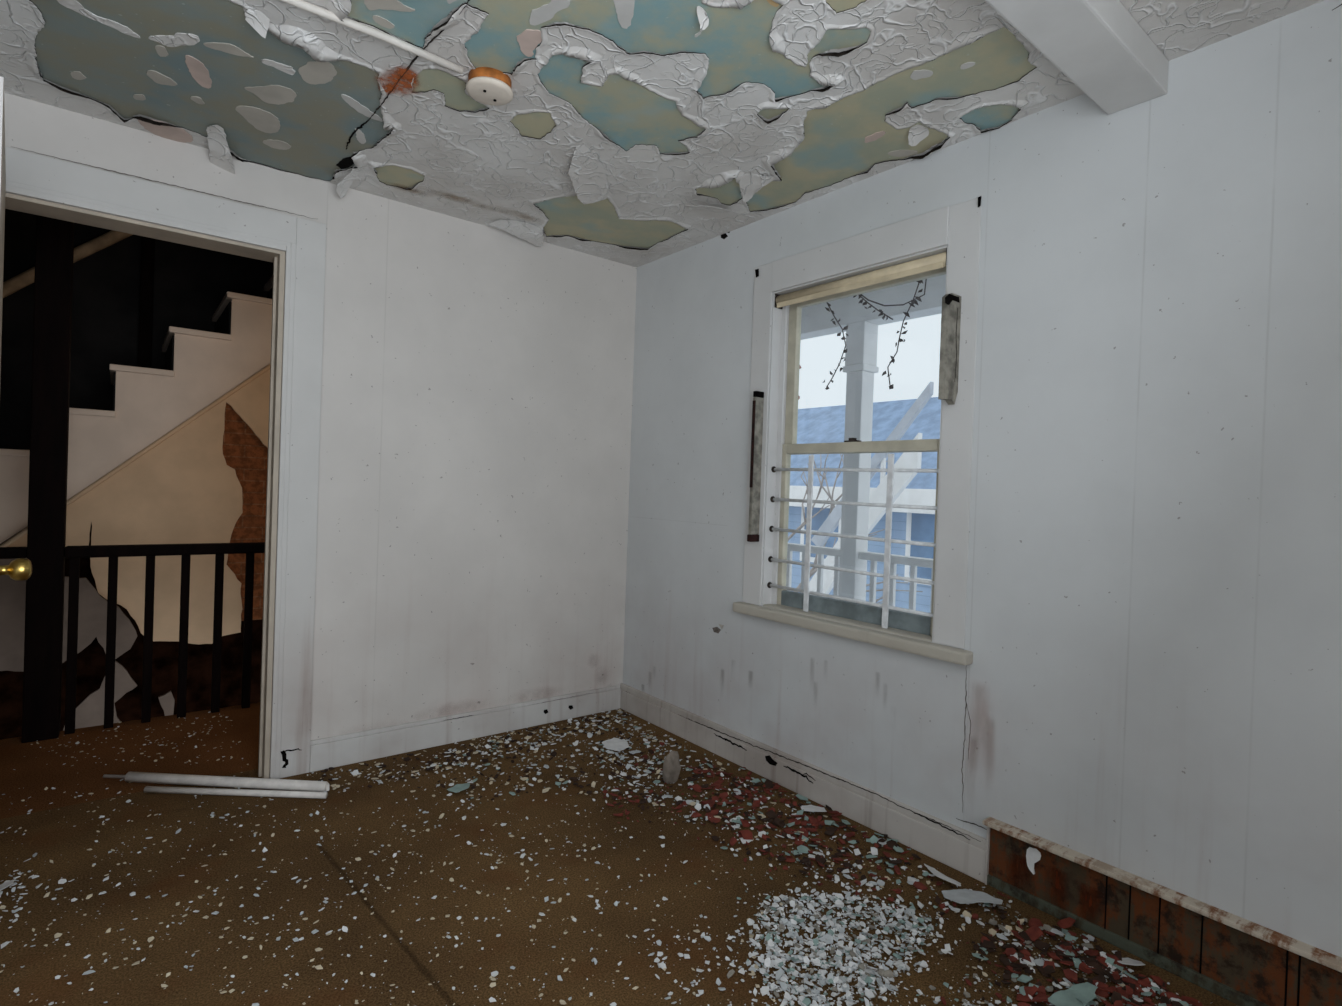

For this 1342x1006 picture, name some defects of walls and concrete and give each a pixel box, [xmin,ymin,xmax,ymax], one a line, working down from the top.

peeling [25,0,427,198]
peeling [325,0,1042,250]
spalling [0,533,27,672]
spalling [62,369,270,731]
corrosion [1012,855,1030,883]